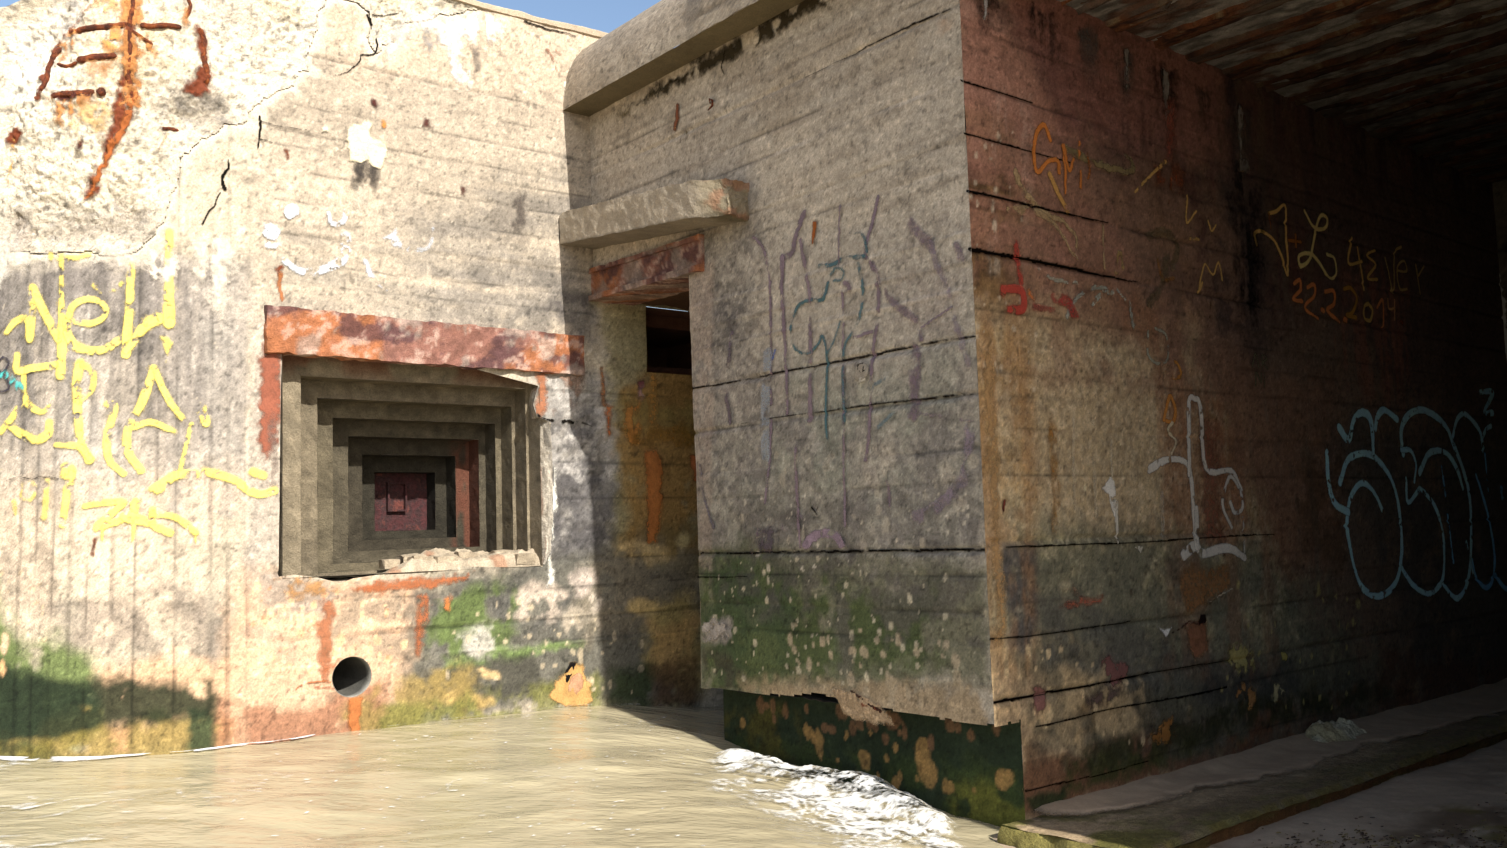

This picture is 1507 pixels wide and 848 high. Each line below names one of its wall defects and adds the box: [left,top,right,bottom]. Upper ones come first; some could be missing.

corrosion [183,8,212,96]
crack [340,13,399,75]
spalling [350,0,479,53]
crack [524,20,575,36]
corrosion [34,0,156,200]
spalling [0,0,325,256]
peeling [322,121,388,169]
spalling [832,689,893,725]